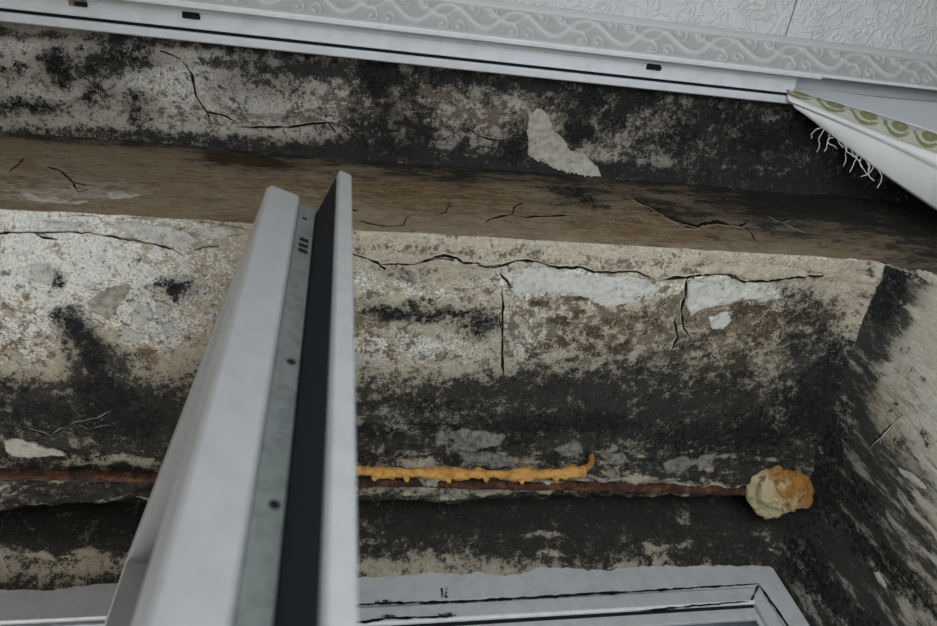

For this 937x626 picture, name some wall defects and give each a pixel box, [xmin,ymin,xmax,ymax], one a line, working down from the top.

crack [160,50,359,139]
flaking render [526,108,601,177]
water stain [702,99,825,159]
crack [0,230,216,256]
crack [485,203,569,223]
flaking render [511,265,655,308]
crack [353,252,824,379]
water stain [864,265,926,329]
water stain [0,306,168,466]
flaking render [4,438,65,459]
spalling [435,427,517,469]
water stain [354,296,937,626]